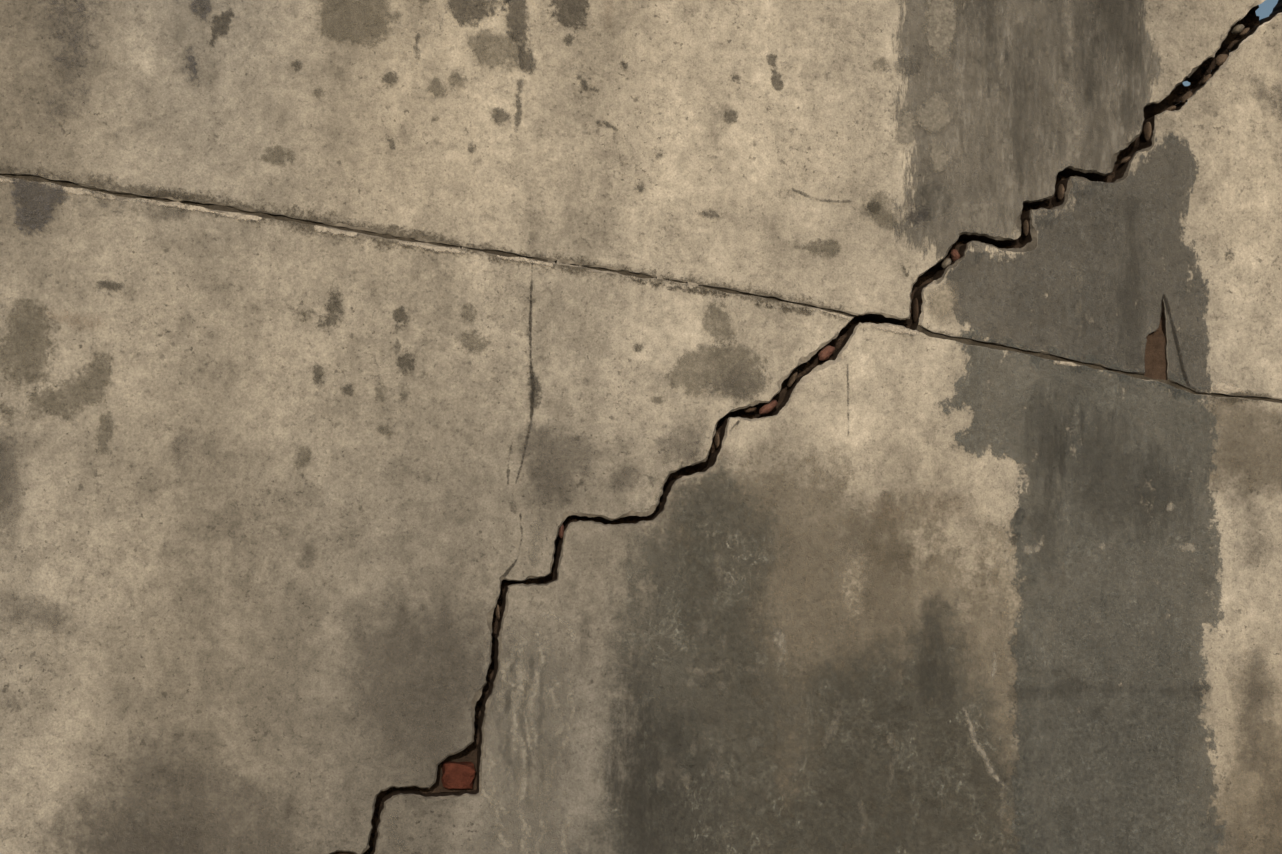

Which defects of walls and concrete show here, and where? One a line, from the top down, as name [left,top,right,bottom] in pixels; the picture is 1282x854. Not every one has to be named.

mould [448,0,536,125]
mould [547,0,589,46]
crack [0,167,859,320]
crack [471,0,1282,763]
damp [591,0,1226,854]
spalling [1144,300,1169,380]
crack [361,785,482,854]